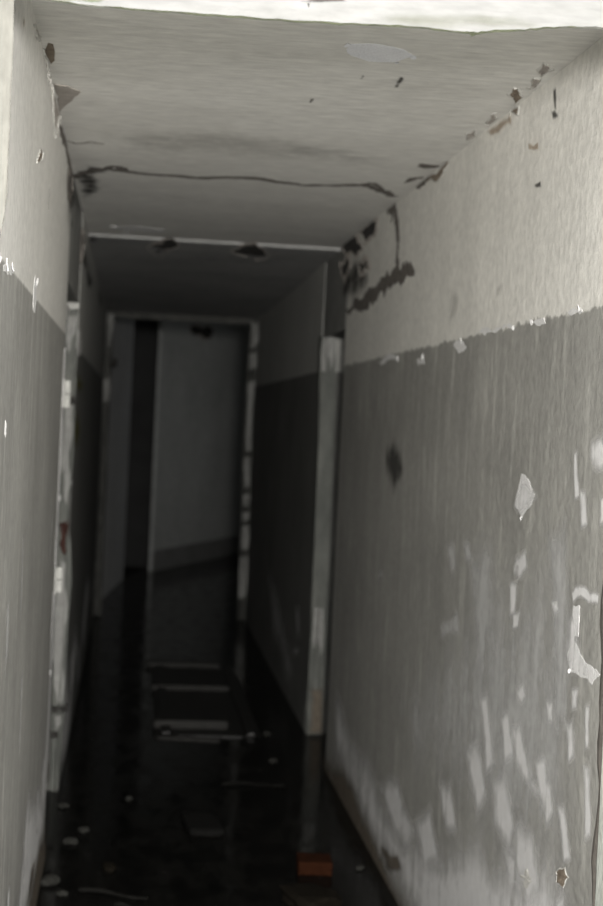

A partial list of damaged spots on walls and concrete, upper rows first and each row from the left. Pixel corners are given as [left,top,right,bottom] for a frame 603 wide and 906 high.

flaking render [33,24,81,140]
flaking render [506,62,555,118]
crack [59,124,439,315]
peeling [0,252,15,275]
peeling [321,337,336,372]
peeling [453,338,466,353]
damp [516,487,532,509]
peeling [515,474,535,521]
damp [60,580,89,767]
peeling [567,605,600,684]
damp [322,545,599,906]
damp [7,629,53,906]